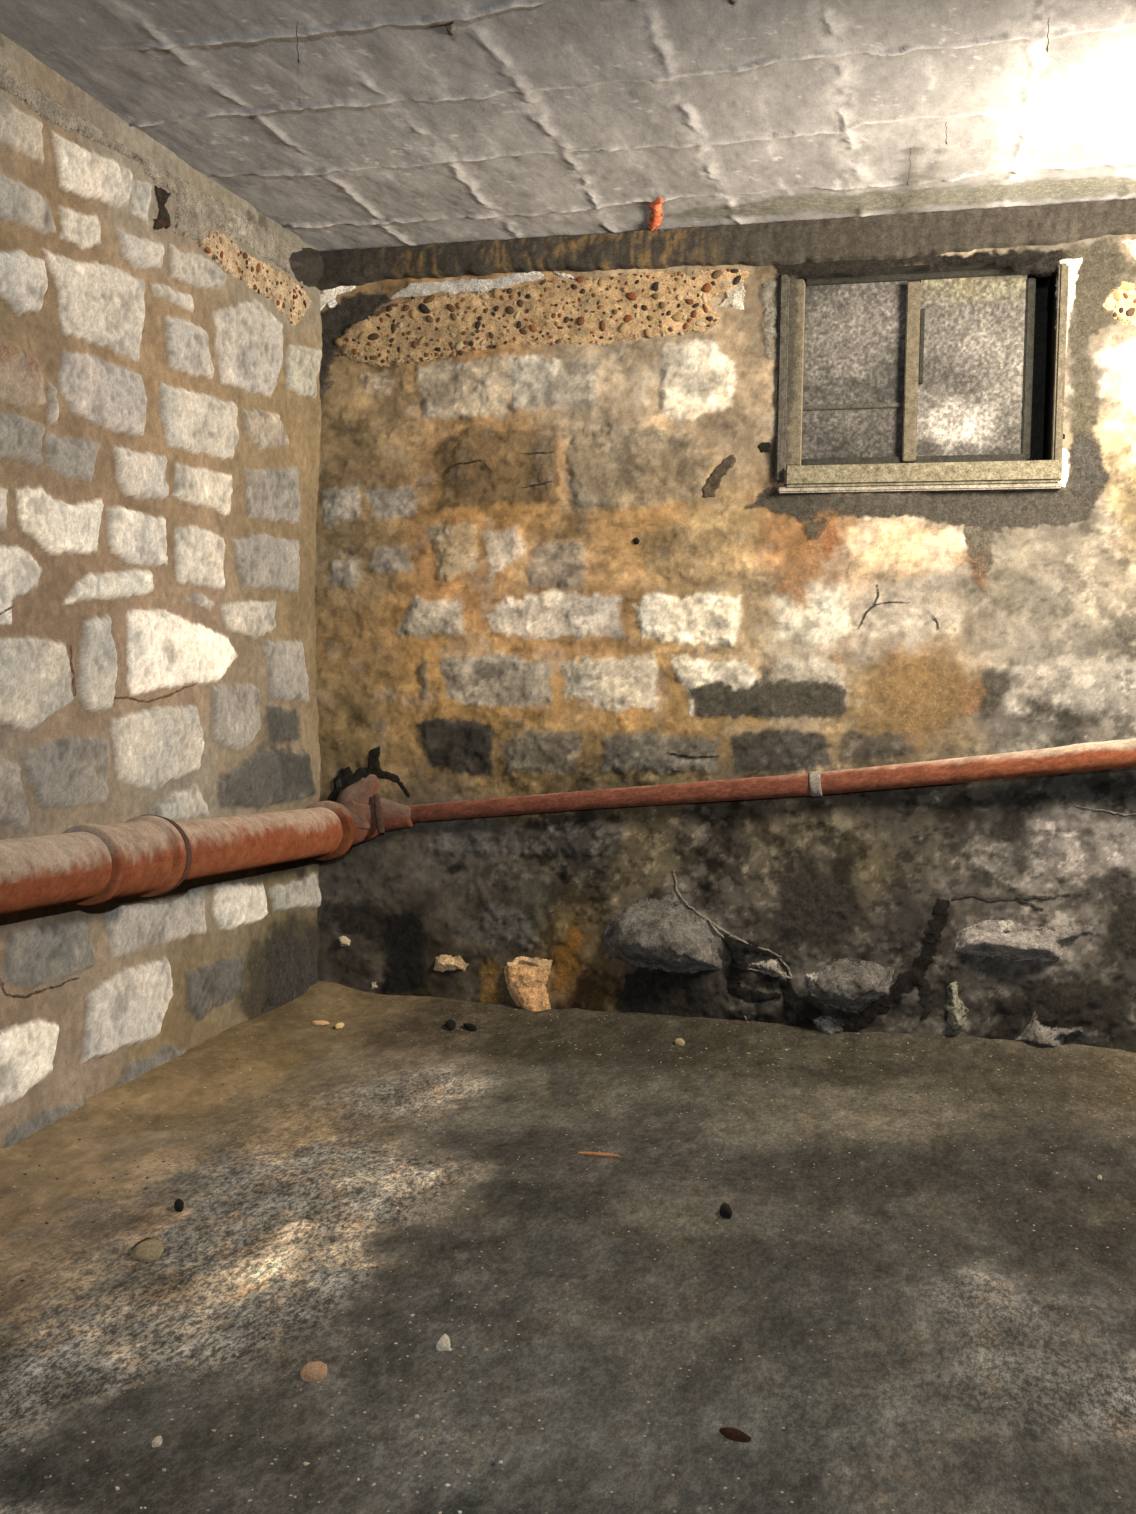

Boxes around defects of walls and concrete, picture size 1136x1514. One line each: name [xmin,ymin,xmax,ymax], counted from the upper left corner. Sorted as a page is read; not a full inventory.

damp [690,667,847,718]
damp [980,670,1011,716]
damp [1027,697,1103,728]
damp [990,813,1025,841]
damp [775,875,868,944]
damp [1058,866,1136,958]
damp [241,900,432,1018]
corrosion [481,963,503,1004]
damp [615,967,743,1020]
crack [673,870,1079,1032]
damp [1028,980,1136,1027]